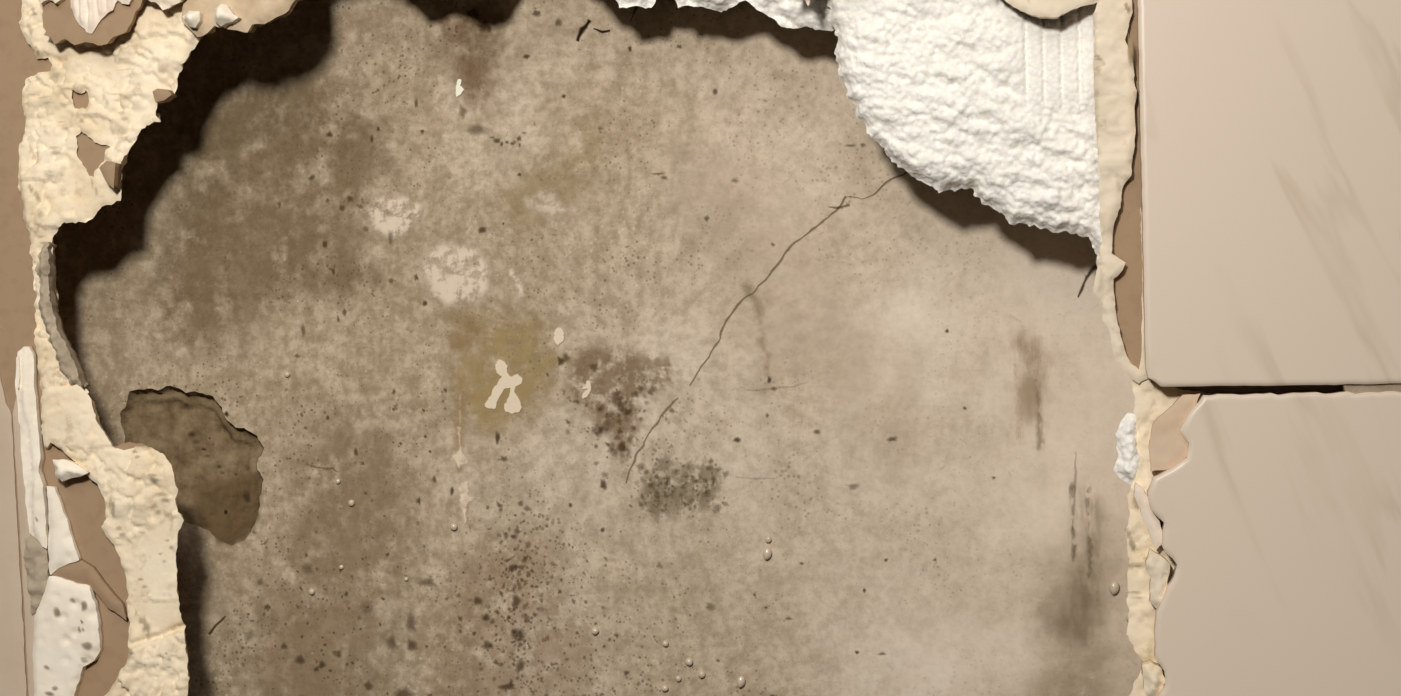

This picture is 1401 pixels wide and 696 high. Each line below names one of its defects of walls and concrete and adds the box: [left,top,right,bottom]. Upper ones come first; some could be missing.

spalling [576,19,610,42]
spalling [18,0,303,696]
leakage [576,355,666,451]
crack [626,171,907,483]
peeling [1005,0,1211,696]